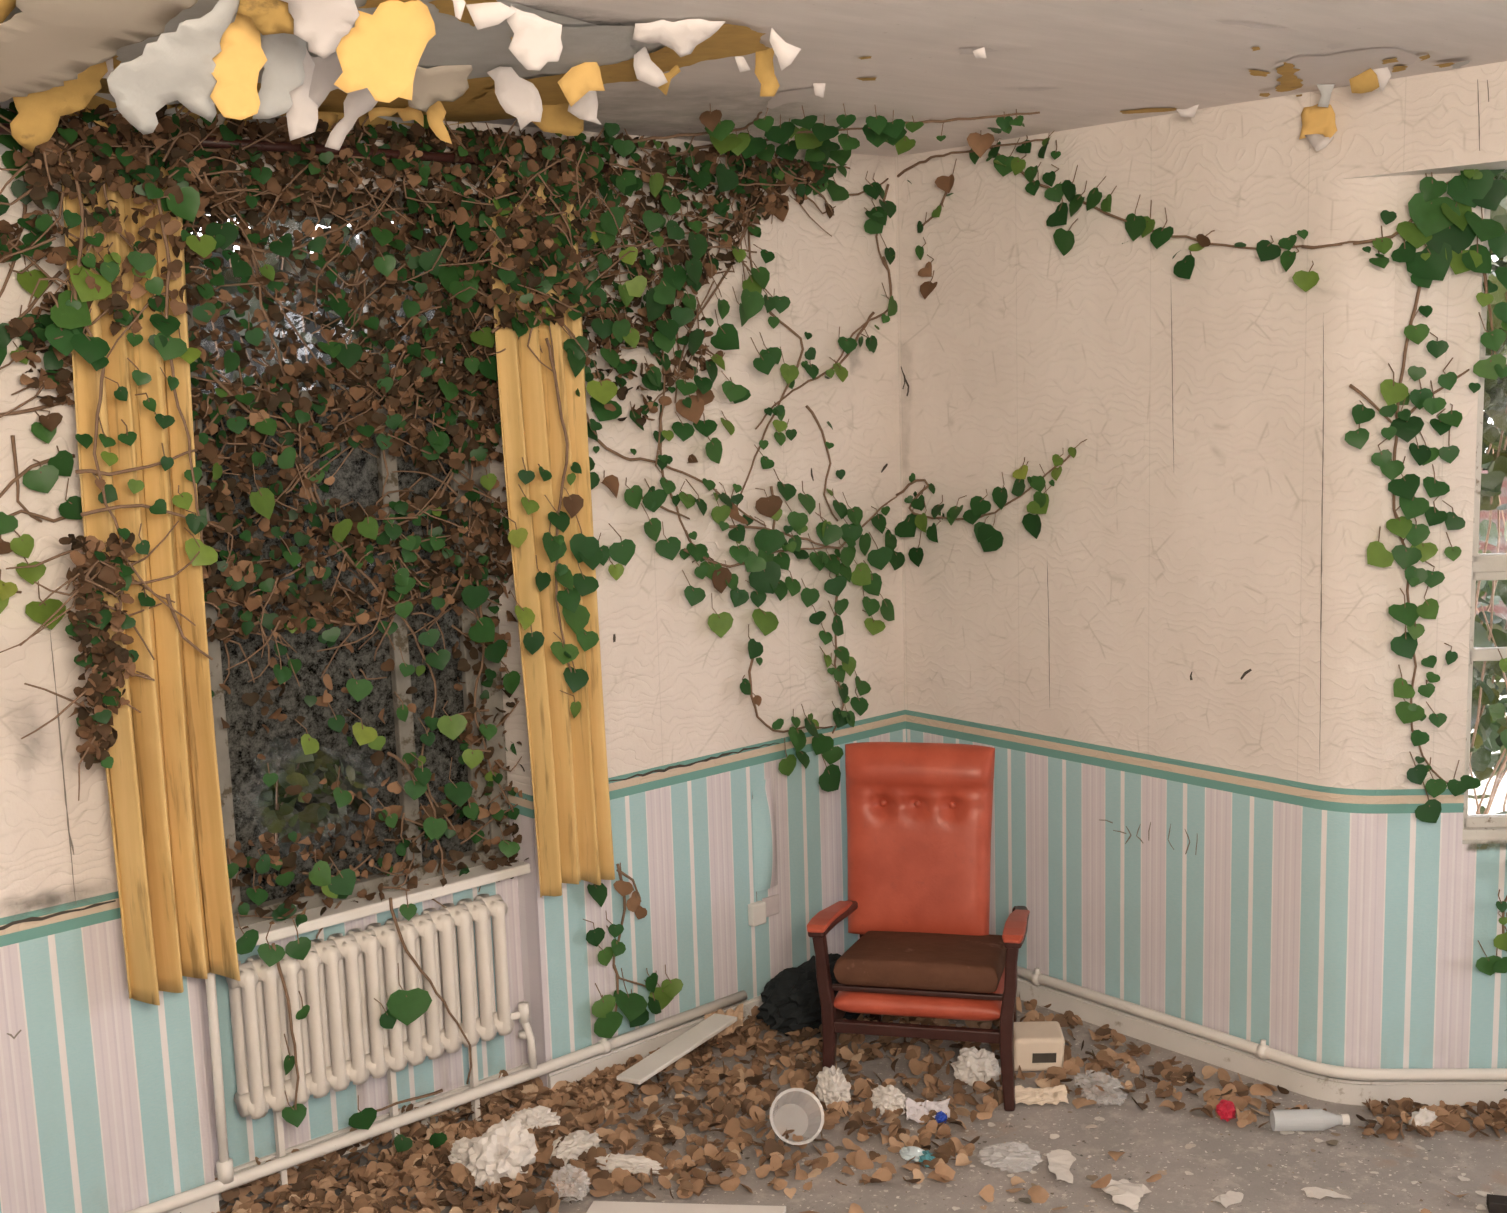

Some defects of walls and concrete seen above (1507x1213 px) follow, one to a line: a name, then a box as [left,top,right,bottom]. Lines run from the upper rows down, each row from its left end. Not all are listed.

peeling [0,0,825,155]
peeling [1249,43,1470,152]